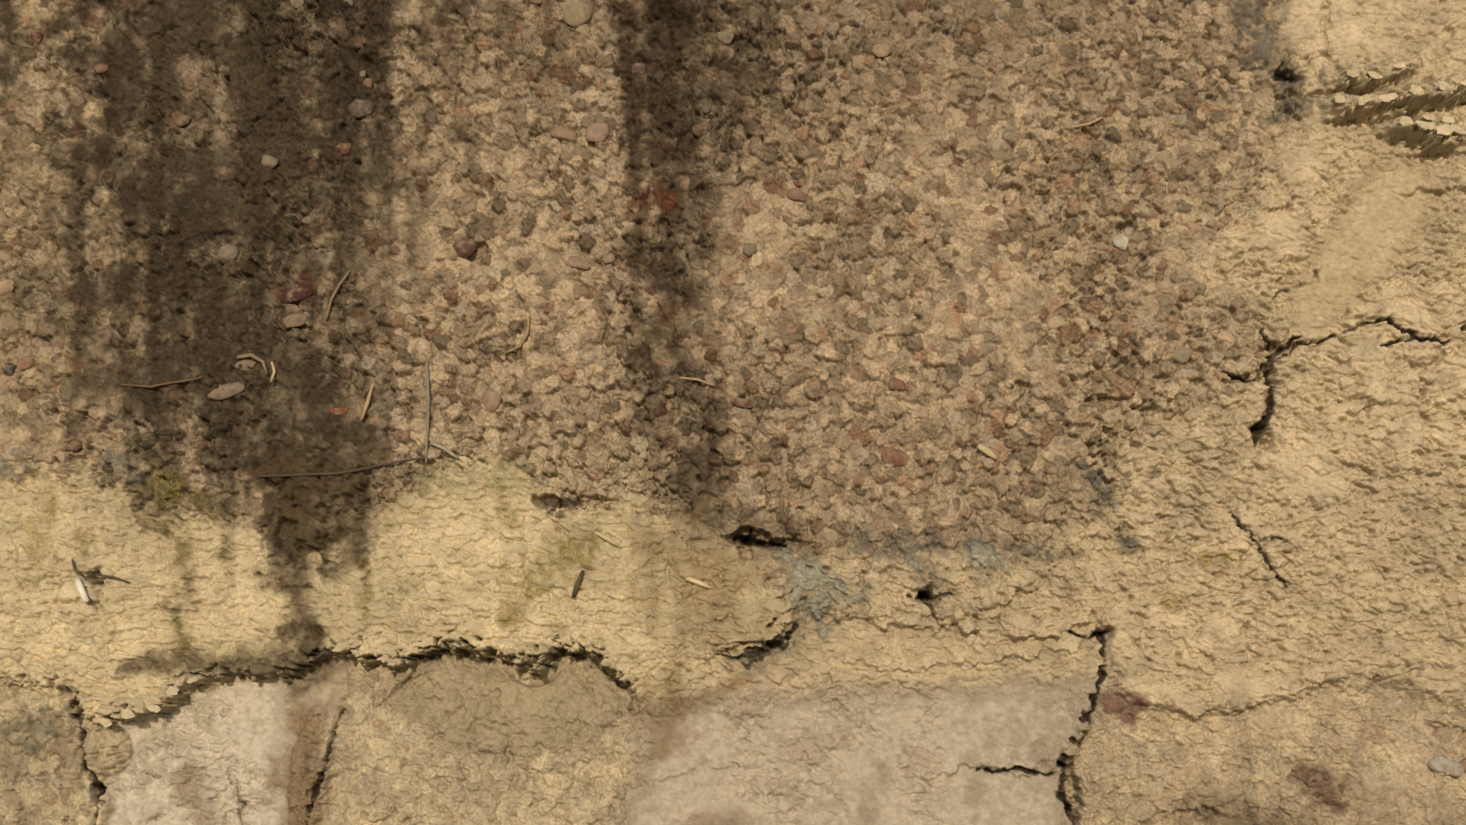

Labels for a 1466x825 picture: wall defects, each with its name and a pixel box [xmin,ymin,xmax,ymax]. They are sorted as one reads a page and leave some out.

leakage [0,0,17,100]
leakage [415,5,457,58]
peeling [1312,56,1466,151]
leakage [614,0,727,379]
spalling [1289,159,1438,328]
leakage [46,0,422,689]
crack [1225,271,1466,444]
crack [1231,513,1288,588]
crack [65,687,107,825]
spalling [97,660,323,825]
spalling [401,655,1102,825]
crack [984,630,1106,817]